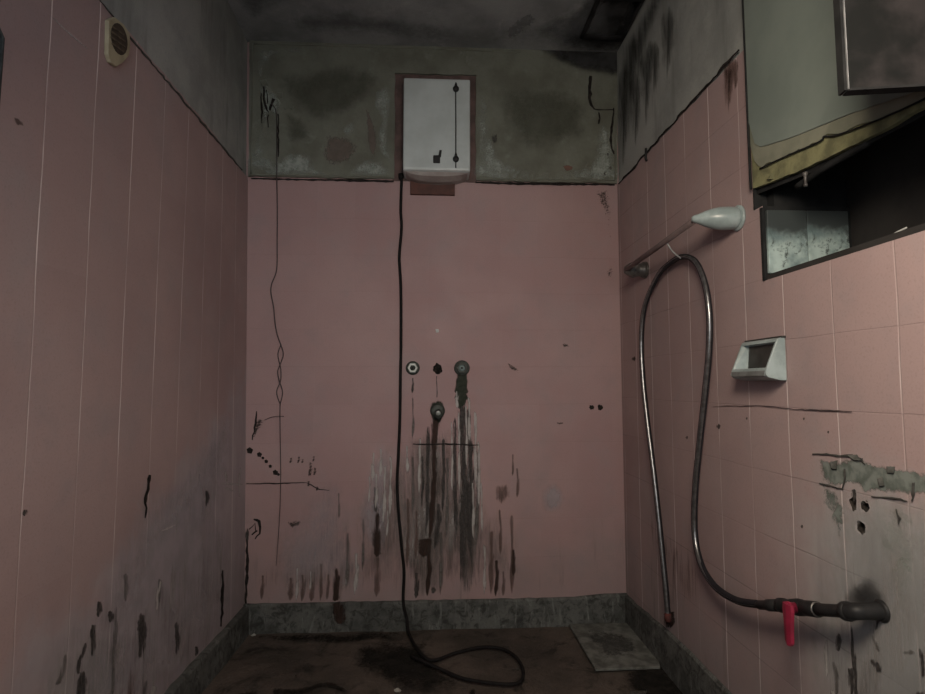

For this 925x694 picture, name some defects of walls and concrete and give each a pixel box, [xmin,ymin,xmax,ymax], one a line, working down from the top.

crack [475,49,739,186]
leakage [368,449,392,536]
leakage [406,375,519,596]
spalling [812,453,925,525]
leakage [852,585,881,602]
leakage [824,628,858,694]